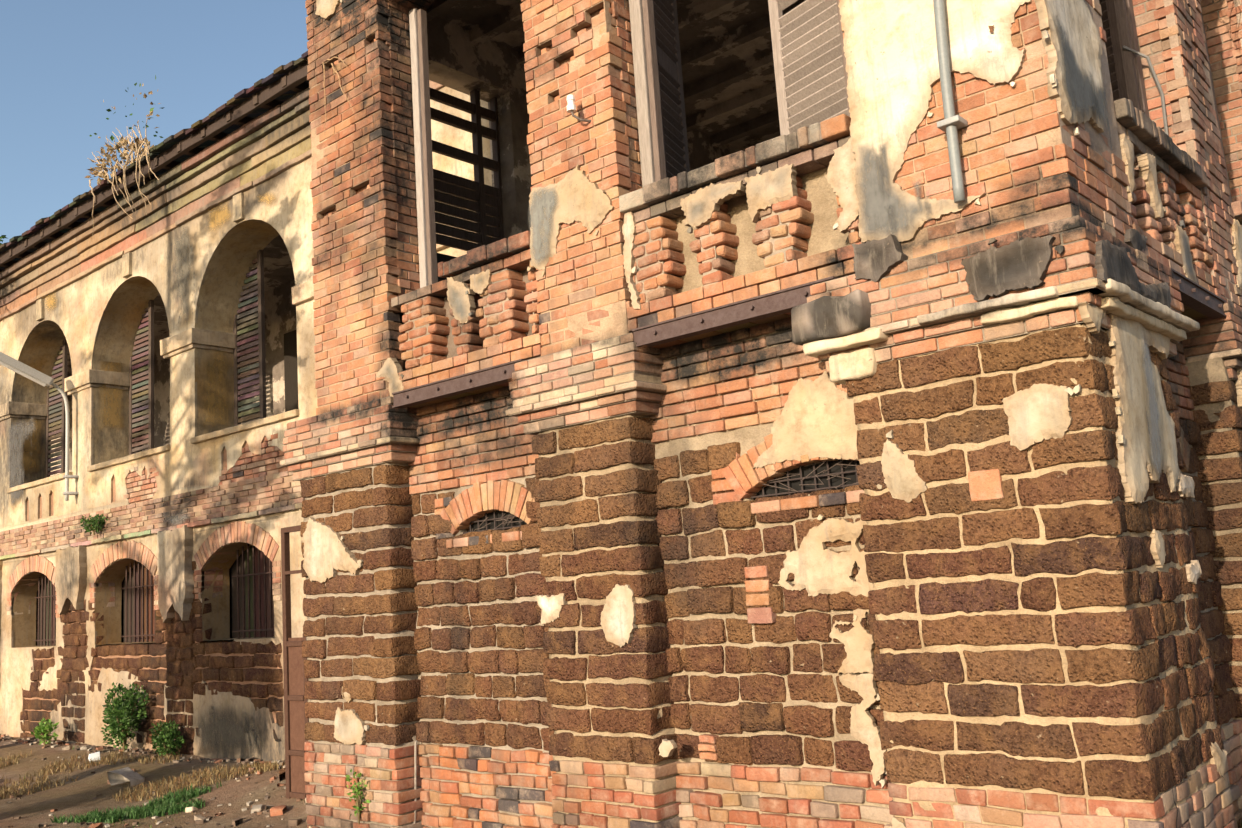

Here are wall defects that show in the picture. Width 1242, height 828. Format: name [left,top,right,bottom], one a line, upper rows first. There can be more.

peeling [838,0,1104,243]
damp [1057,19,1109,128]
damp [861,146,928,233]
peeling [778,514,887,789]
damp [198,707,262,750]